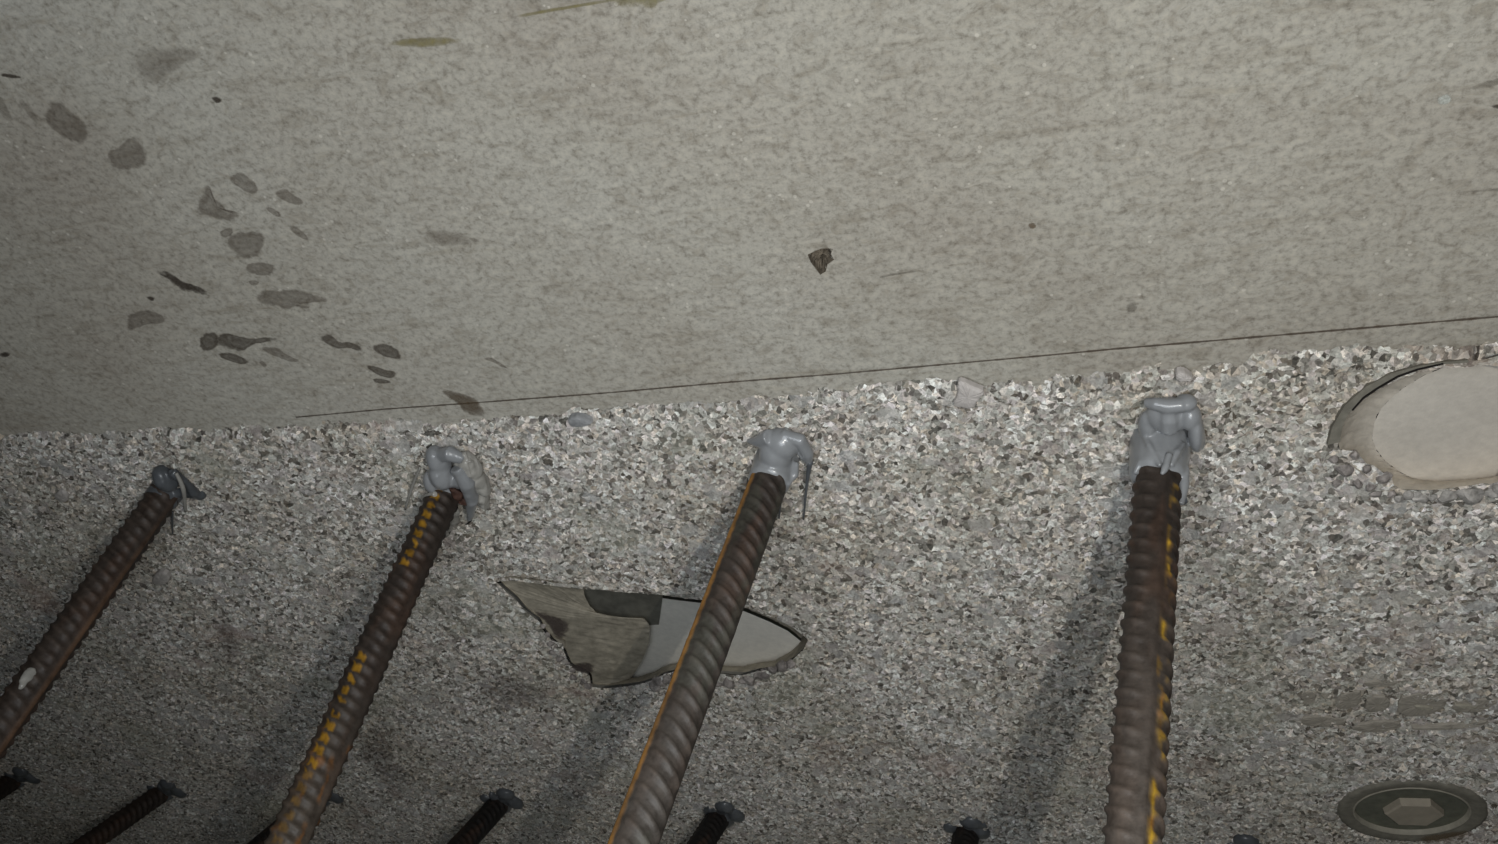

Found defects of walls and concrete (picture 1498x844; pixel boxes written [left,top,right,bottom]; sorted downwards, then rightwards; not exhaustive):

leakage [162,272,204,294]
leakage [200,333,268,364]
leakage [322,335,400,383]
leakage [449,394,480,412]
spalling [0,465,206,800]
spalling [247,445,491,844]
spalling [607,427,814,844]
spalling [1102,394,1206,844]
peeling [1300,679,1497,732]
spalling [69,779,187,844]
spalling [447,788,523,844]
spalling [943,816,990,844]